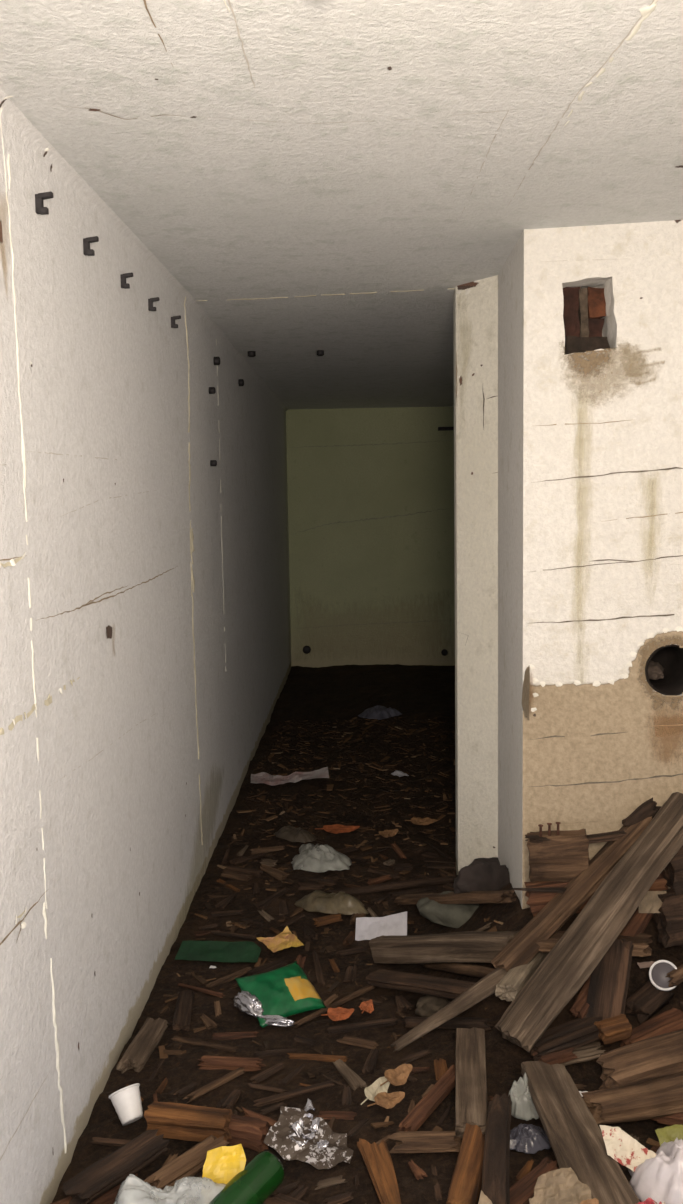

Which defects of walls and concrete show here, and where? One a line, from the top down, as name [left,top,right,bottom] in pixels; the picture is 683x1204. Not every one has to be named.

crack [143,0,173,66]
crack [211,0,361,124]
crack [455,0,654,213]
damp [563,342,611,377]
crack [540,467,683,482]
crack [532,555,683,572]
crack [38,567,176,620]
crack [535,614,674,623]
peeling [522,626,683,909]
crack [0,895,43,945]